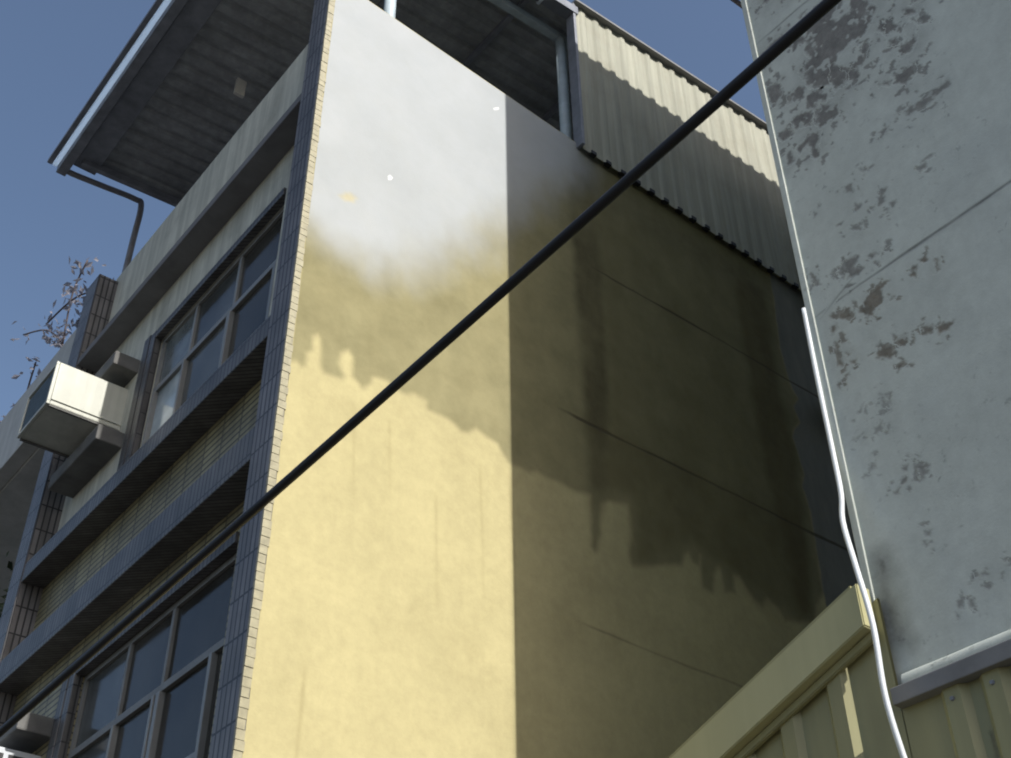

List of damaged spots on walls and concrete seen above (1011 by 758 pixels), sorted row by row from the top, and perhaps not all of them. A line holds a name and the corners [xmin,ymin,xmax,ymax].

peeling [755,0,954,186]
damp [291,0,825,720]
flaking render [768,160,957,609]
peeling [952,548,1011,625]